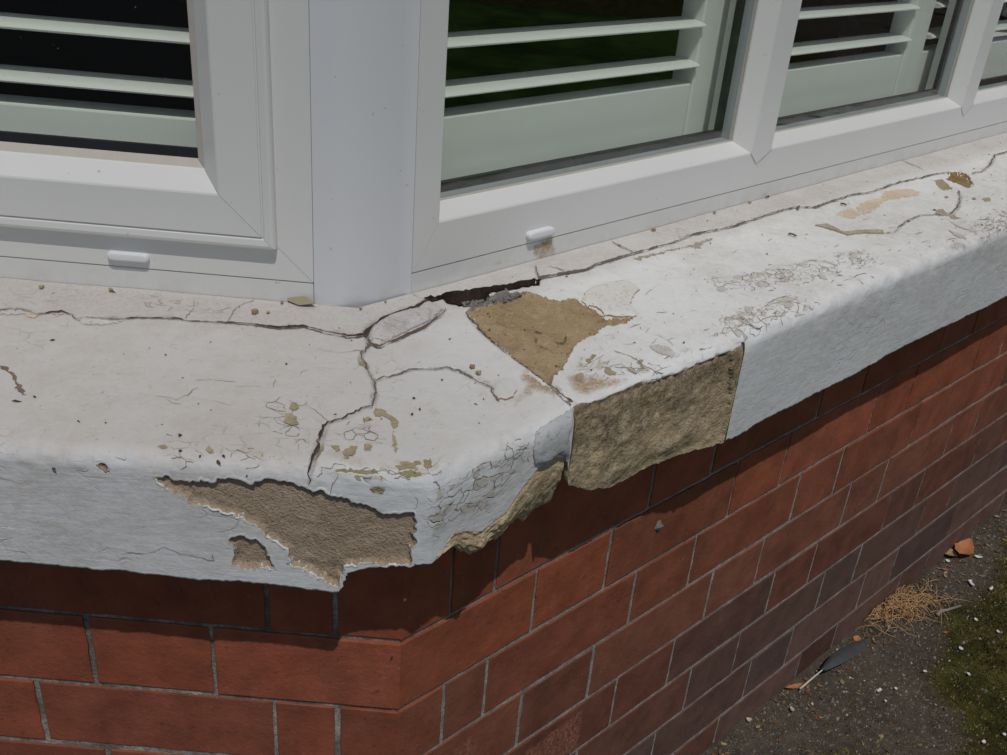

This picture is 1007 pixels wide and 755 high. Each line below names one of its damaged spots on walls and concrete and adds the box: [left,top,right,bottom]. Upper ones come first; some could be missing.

crack [536,151,1007,350]
peeling [815,189,921,236]
spalling [933,171,992,239]
flaking render [463,280,640,388]
peeling [283,403,299,425]
crack [0,289,672,537]
peeling [314,443,385,494]
peeling [363,407,433,478]
spalling [431,342,745,564]
flaking render [152,473,420,590]